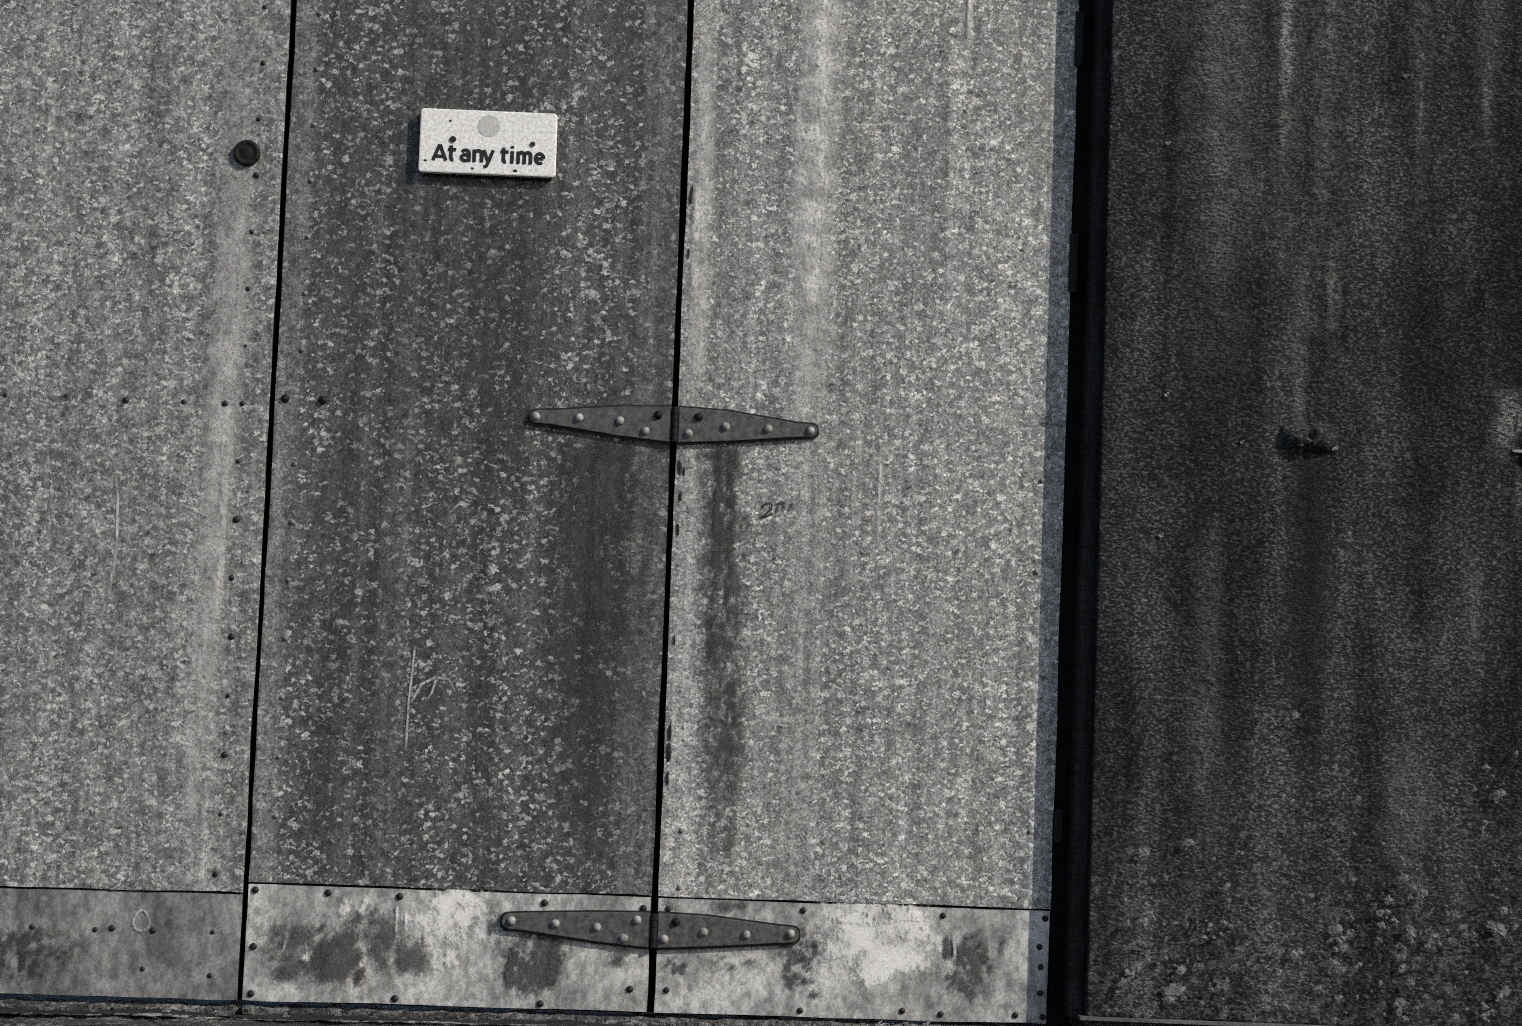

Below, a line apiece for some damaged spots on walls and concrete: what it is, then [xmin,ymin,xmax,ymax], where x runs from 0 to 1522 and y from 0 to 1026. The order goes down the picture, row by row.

leakage [1277,0,1298,94]
leakage [1316,1,1343,201]
leakage [1292,268,1305,426]
leakage [1327,242,1340,327]
corrosion [705,448,745,785]